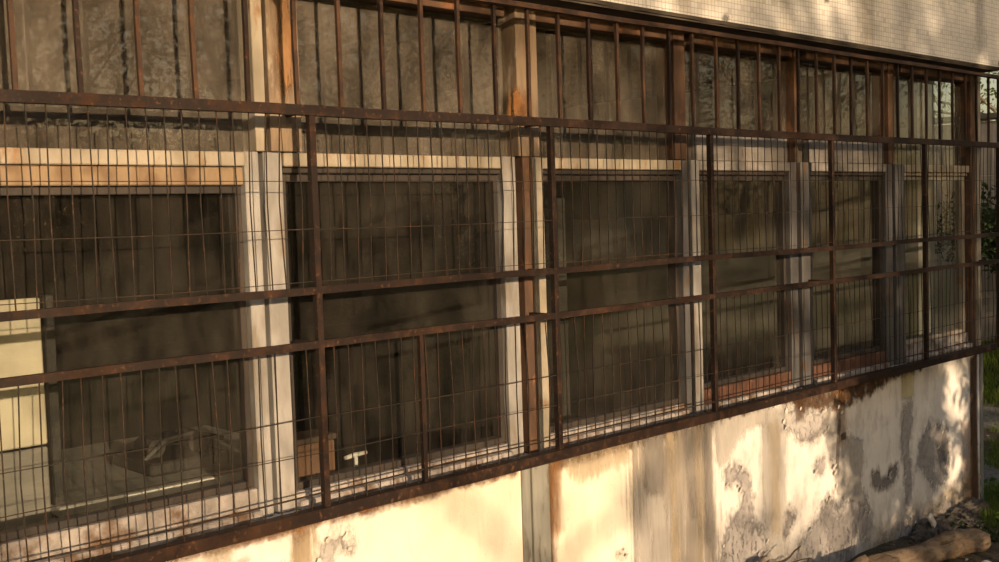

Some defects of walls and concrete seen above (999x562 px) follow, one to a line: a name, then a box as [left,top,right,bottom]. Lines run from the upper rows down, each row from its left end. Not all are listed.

corrosion [773,369,922,420]
corrosion [205,522,322,562]
peeling [317,532,353,562]
damp [630,406,788,562]
peeling [718,463,770,562]
peeling [783,402,953,562]